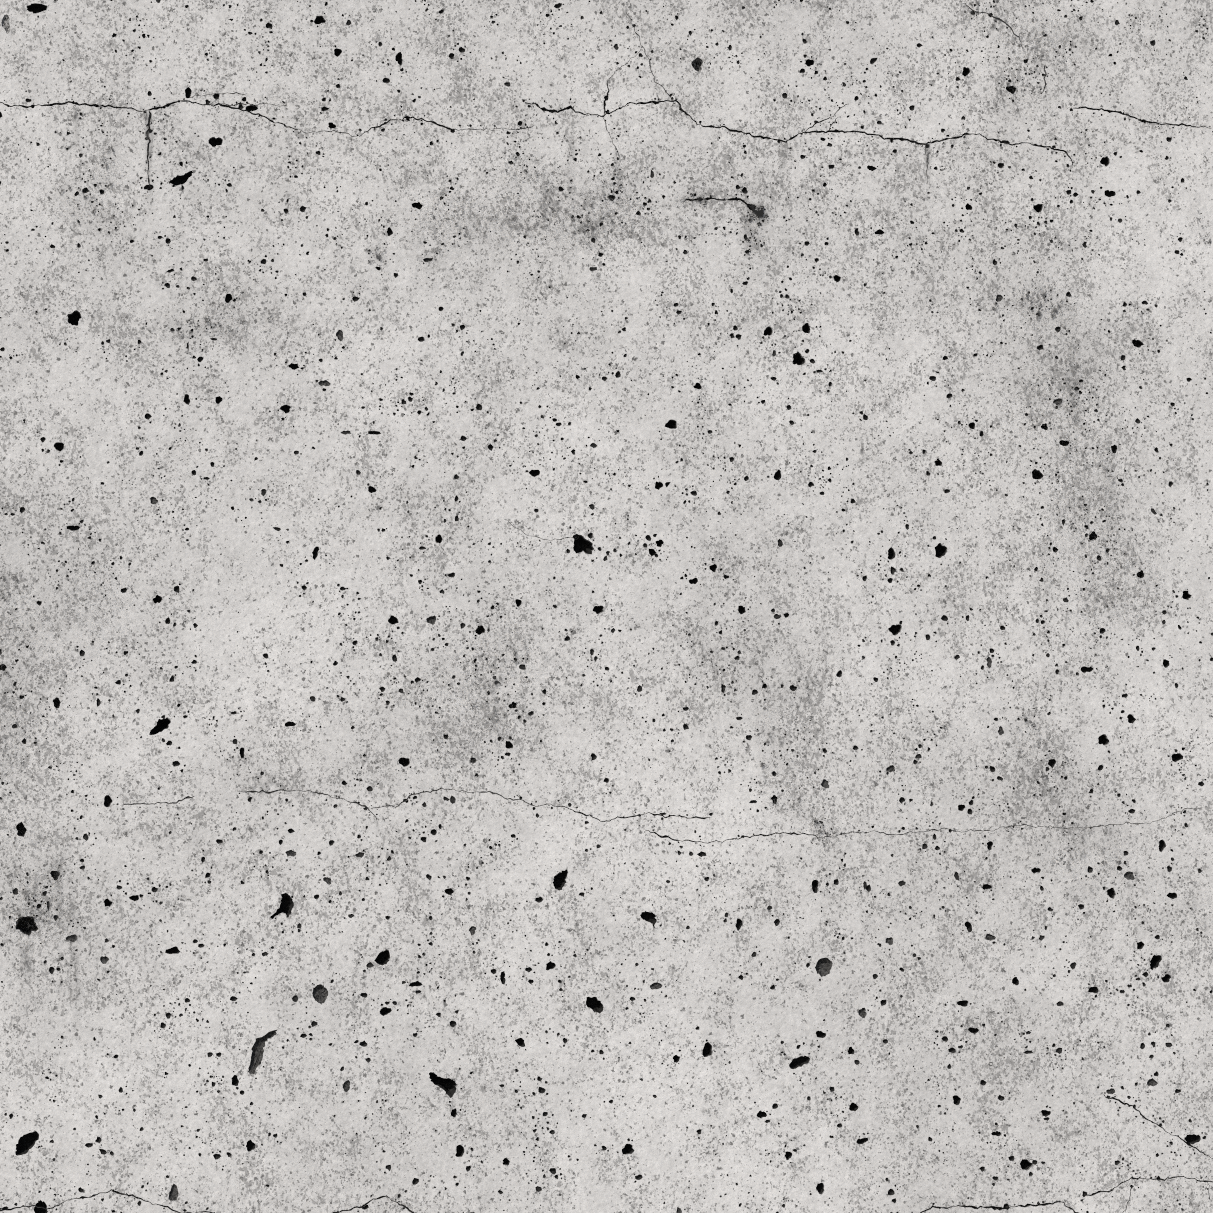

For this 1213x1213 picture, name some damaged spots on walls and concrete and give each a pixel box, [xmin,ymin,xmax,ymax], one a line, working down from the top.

crack [0,4,1073,186]
crack [1075,106,1211,129]
crack [684,197,757,209]
crack [890,1095,1213,1213]
crack [0,1189,213,1213]
crack [333,1196,414,1213]